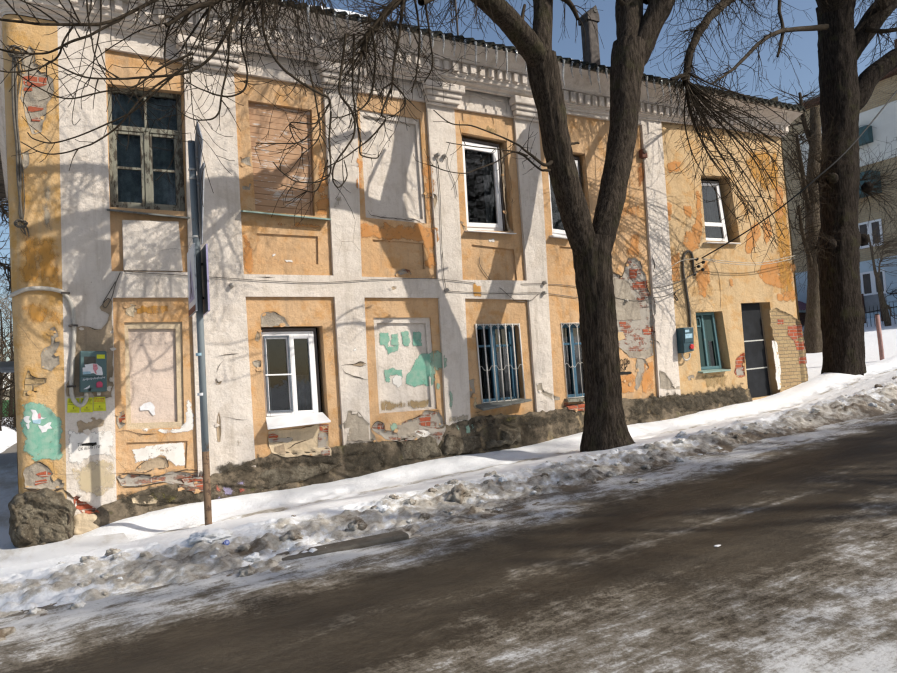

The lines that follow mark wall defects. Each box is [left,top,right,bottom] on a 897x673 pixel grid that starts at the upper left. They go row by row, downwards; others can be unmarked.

spalling [20,46,54,134]
peeling [255,311,290,341]
spalling [613,258,656,390]
peeling [24,327,63,396]
peeling [659,371,694,389]
spalling [734,352,745,377]
spalling [769,308,808,392]
spalling [268,409,446,457]
spalling [23,462,65,490]
spalling [72,494,100,514]
spalling [116,457,203,504]